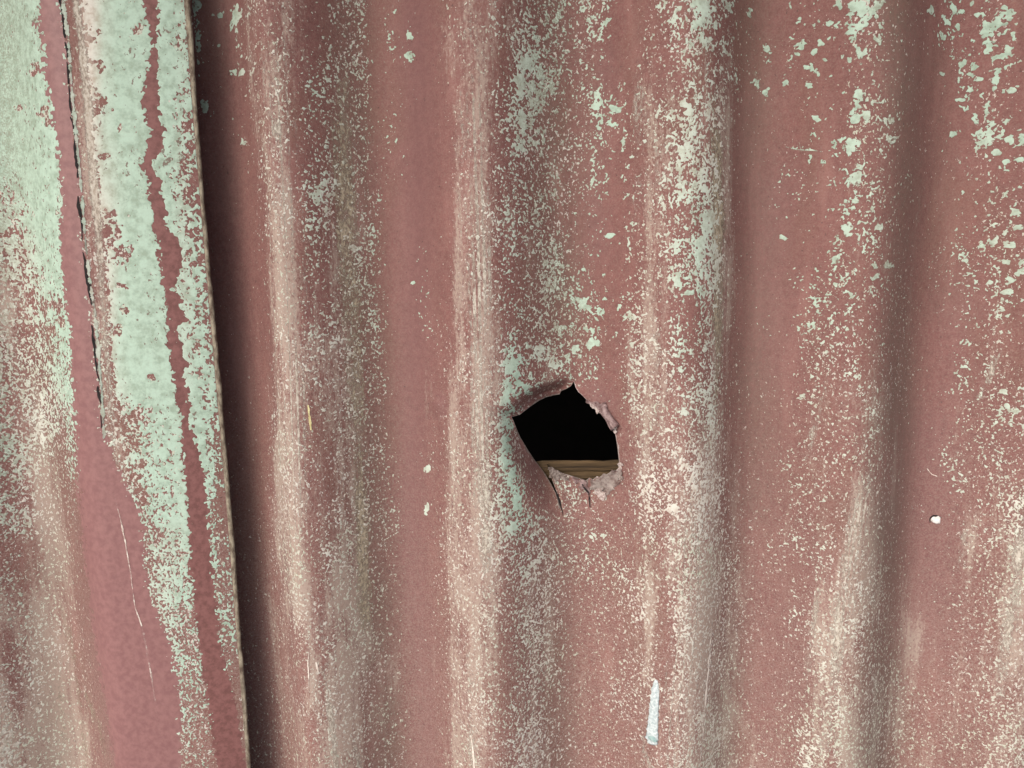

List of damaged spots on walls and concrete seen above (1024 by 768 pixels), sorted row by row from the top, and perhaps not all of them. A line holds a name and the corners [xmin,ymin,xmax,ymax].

crack [58,0,105,439]
peeling [0,0,408,768]
peeling [380,0,415,63]
peeling [410,0,916,768]
peeling [912,0,1024,768]